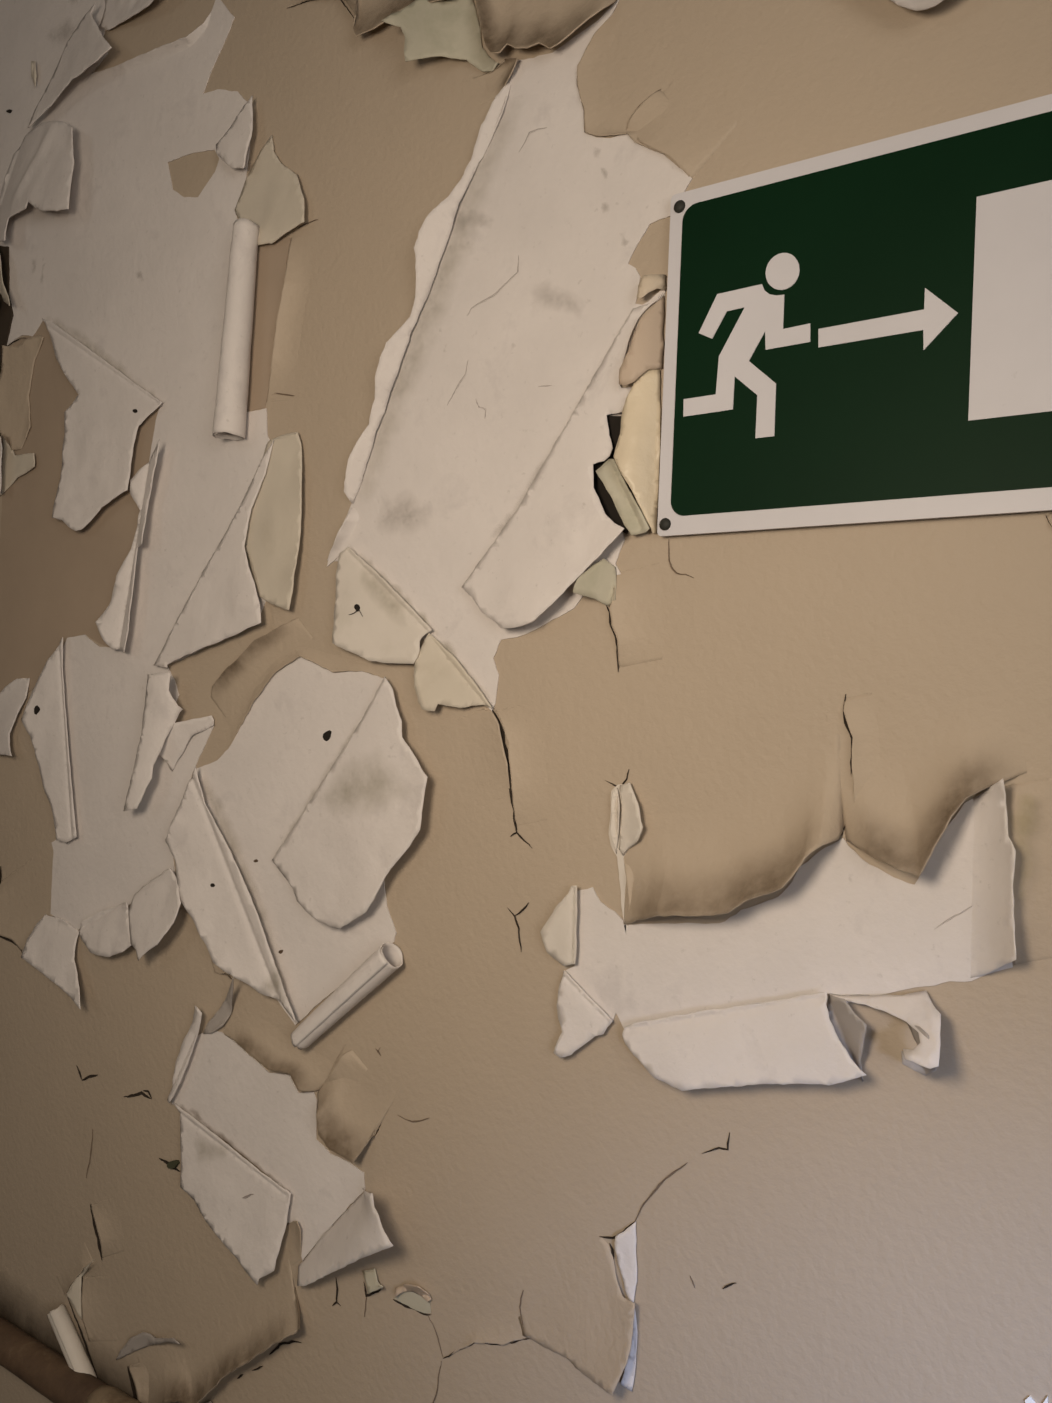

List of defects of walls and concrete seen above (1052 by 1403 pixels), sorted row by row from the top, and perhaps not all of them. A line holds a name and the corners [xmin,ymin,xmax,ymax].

peeling [891,0,944,11]
peeling [0,0,737,1317]
crack [455,705,548,849]
peeling [540,682,1052,1091]